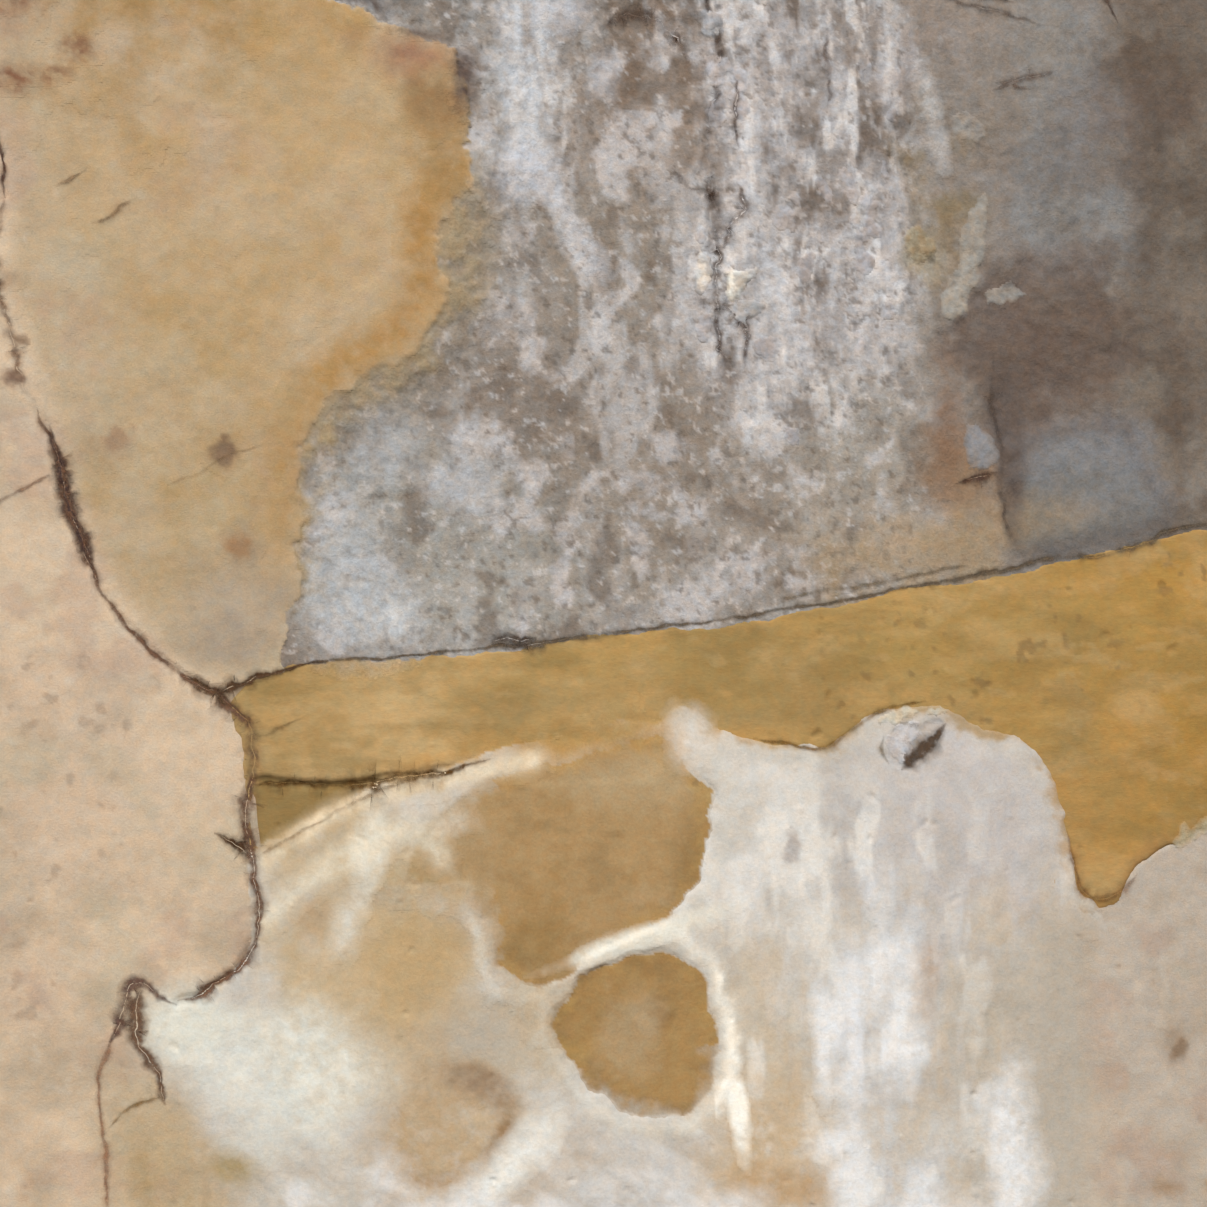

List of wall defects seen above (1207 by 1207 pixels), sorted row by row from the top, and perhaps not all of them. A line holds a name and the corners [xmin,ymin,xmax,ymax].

crack [0,144,8,192]
crack [706,186,747,283]
crack [714,319,750,356]
spalling [309,0,1207,660]
water stain [0,740,574,1207]
crack [18,419,1206,1200]
water stain [523,894,783,1207]
flaking render [221,690,1111,1207]
efflorescence [659,695,720,779]
efflorescence [798,805,1060,1207]
spalling [1129,1166,1197,1207]
spalling [1157,1021,1197,1079]